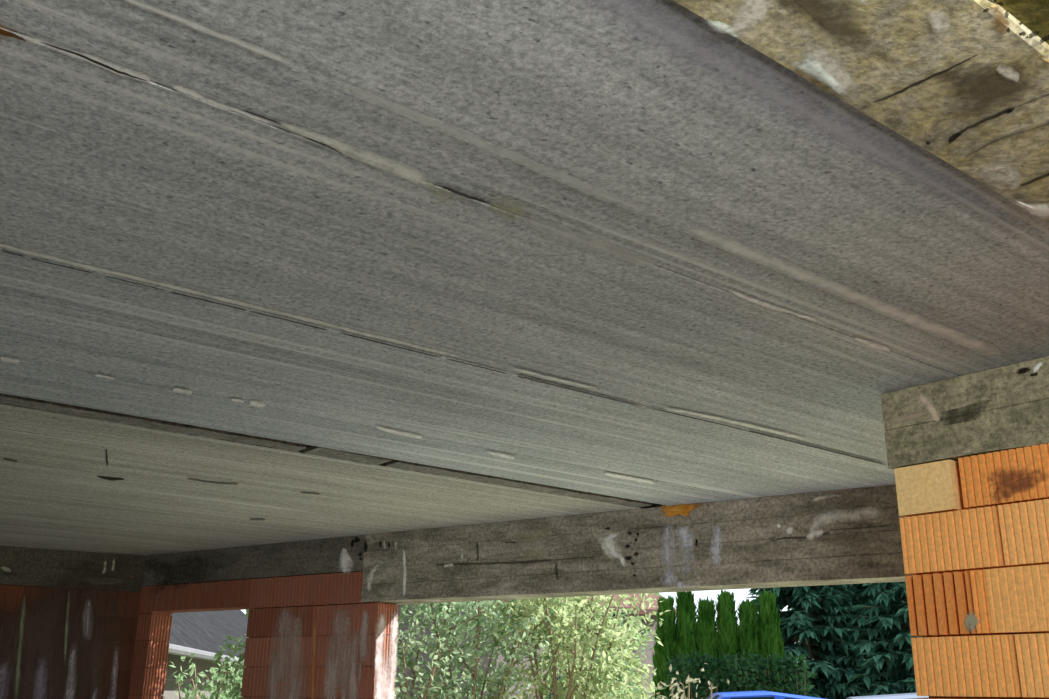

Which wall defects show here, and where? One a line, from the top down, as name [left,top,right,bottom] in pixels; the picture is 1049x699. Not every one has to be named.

damp [708,0,869,43]
damp [930,11,949,31]
crack [874,55,976,102]
damp [941,65,1028,113]
crack [926,94,1049,155]
crack [1016,173,1049,188]
crack [0,243,885,465]